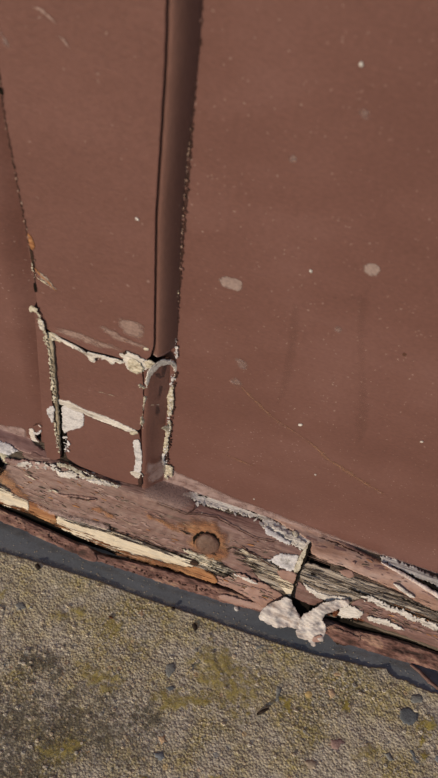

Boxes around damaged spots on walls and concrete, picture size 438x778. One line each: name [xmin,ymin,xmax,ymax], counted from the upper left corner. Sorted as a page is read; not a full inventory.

crack [58,399,138,435]
peeling [0,305,217,565]
crack [64,502,277,579]
corrosion [147,515,228,560]
crack [291,542,310,598]
peeling [187,491,438,610]
peeling [217,573,438,647]